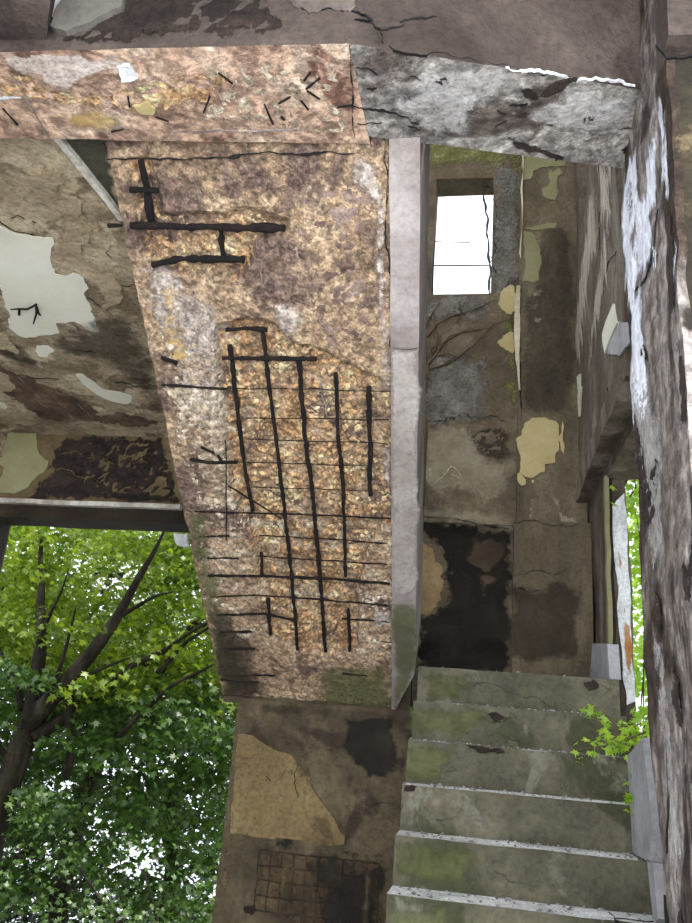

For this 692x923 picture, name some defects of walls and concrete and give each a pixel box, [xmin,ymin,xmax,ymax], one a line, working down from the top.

crack [106,7,635,205]
peeling [0,166,124,357]
flaking render [0,362,179,503]
spalling [107,155,392,657]
crack [383,155,391,274]
water stain [352,160,578,672]
flaking render [471,417,565,486]
flaking render [497,137,566,390]
efflorescence [575,166,612,367]
water stain [622,99,669,565]
flaking render [230,734,345,846]
water stain [657,647,681,859]